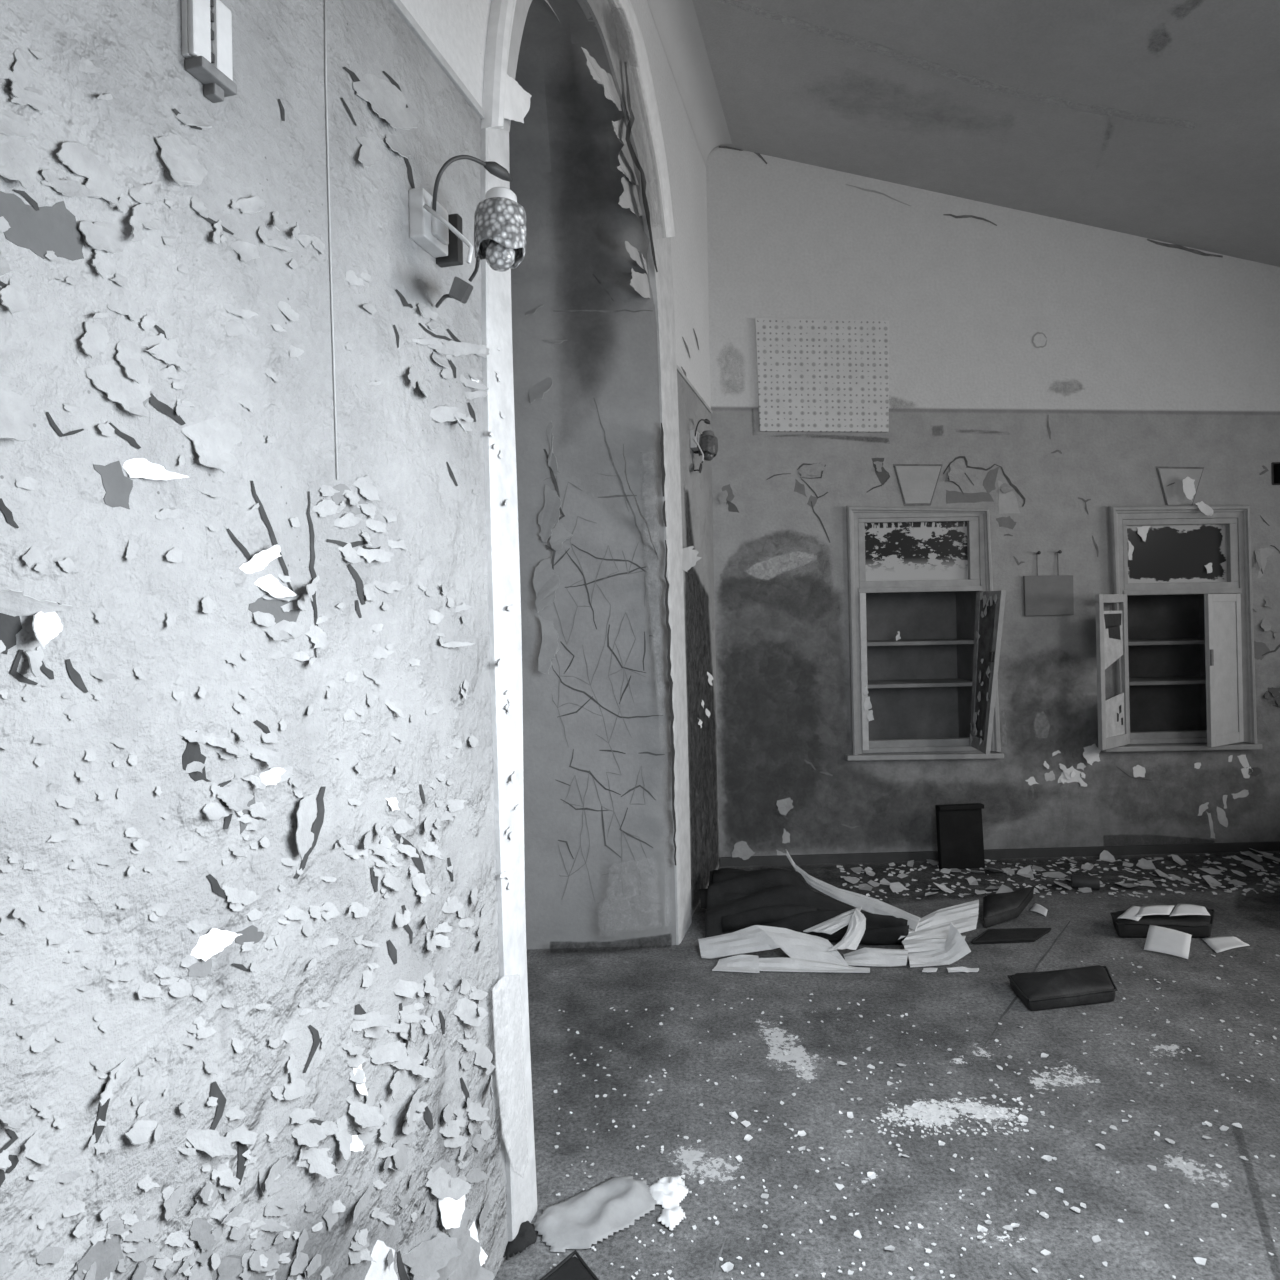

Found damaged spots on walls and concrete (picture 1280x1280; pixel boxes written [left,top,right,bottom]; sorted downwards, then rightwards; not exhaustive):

peeling [0,50,161,321]
peeling [0,589,88,693]
peeling [93,422,189,509]
peeling [79,321,243,473]
peeling [182,720,298,858]
peeling [227,481,394,658]
crack [545,399,676,904]
water stain [685,492,694,549]
water stain [685,552,946,909]
water stain [785,835,1280,900]
peeling [283,787,528,1280]
peeling [179,1059,258,1280]